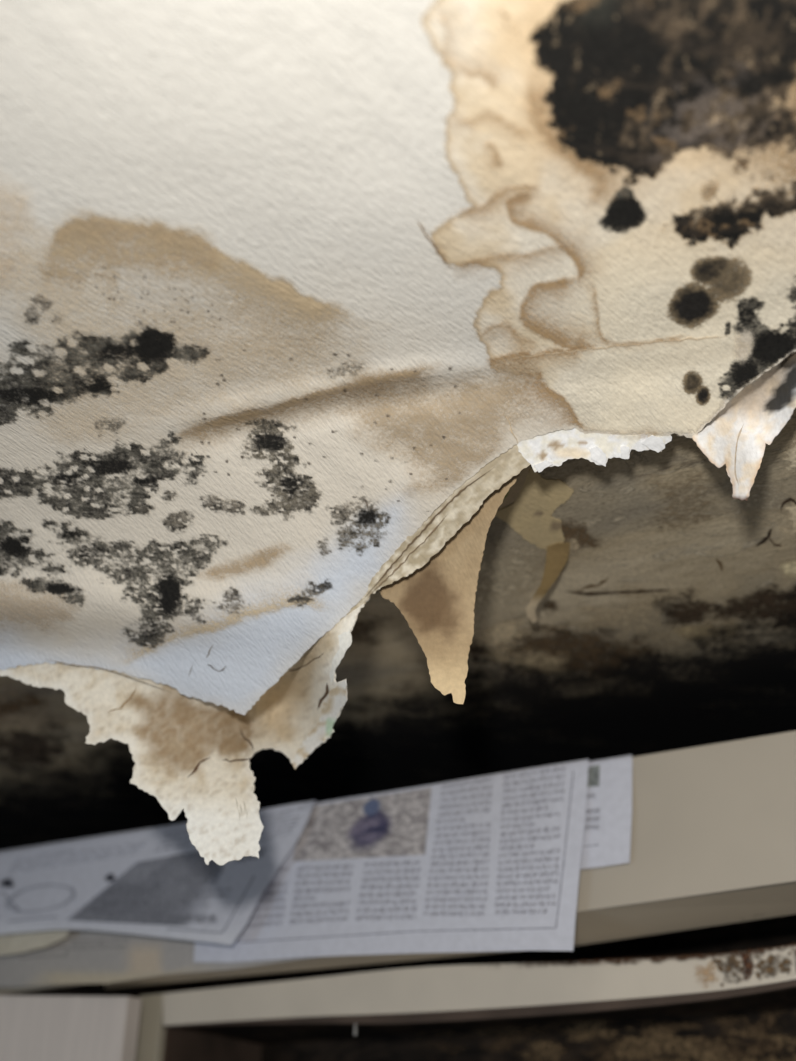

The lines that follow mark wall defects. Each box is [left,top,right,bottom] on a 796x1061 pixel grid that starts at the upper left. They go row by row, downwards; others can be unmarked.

damp [0,0,796,653]
peeling [589,446,606,467]
peeling [620,446,630,459]
peeling [642,435,665,452]
peeling [692,351,796,501]
peeling [783,503,796,535]
peeling [474,460,579,673]
rust [526,944,796,982]